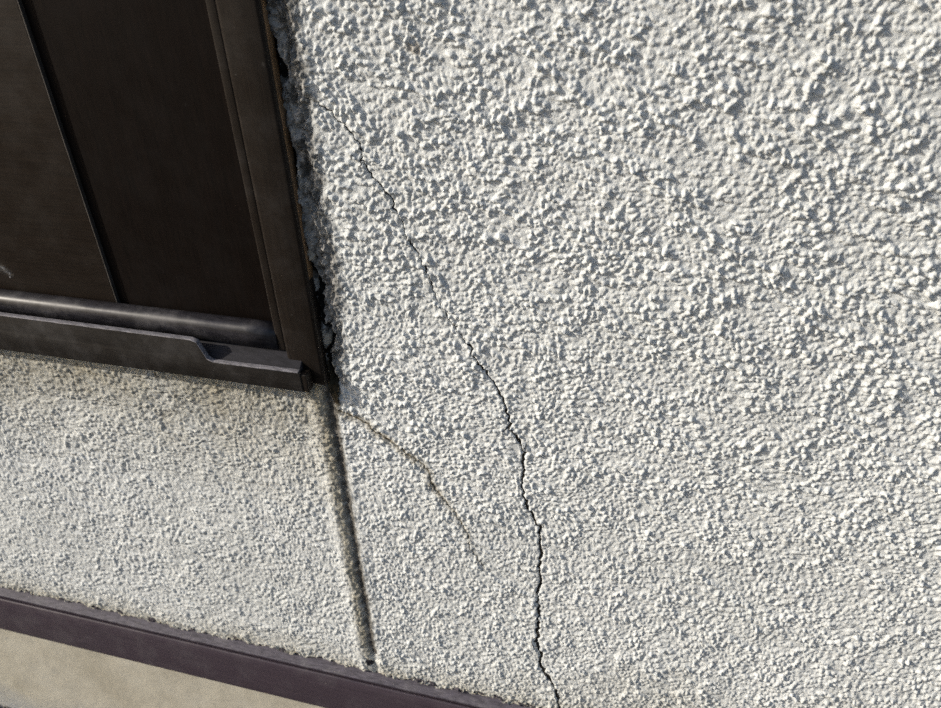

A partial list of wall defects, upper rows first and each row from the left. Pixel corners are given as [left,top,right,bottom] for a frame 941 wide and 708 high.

damp [266,0,298,106]
damp [295,129,319,216]
damp [0,349,284,414]
crack [288,82,560,708]
damp [301,298,368,653]